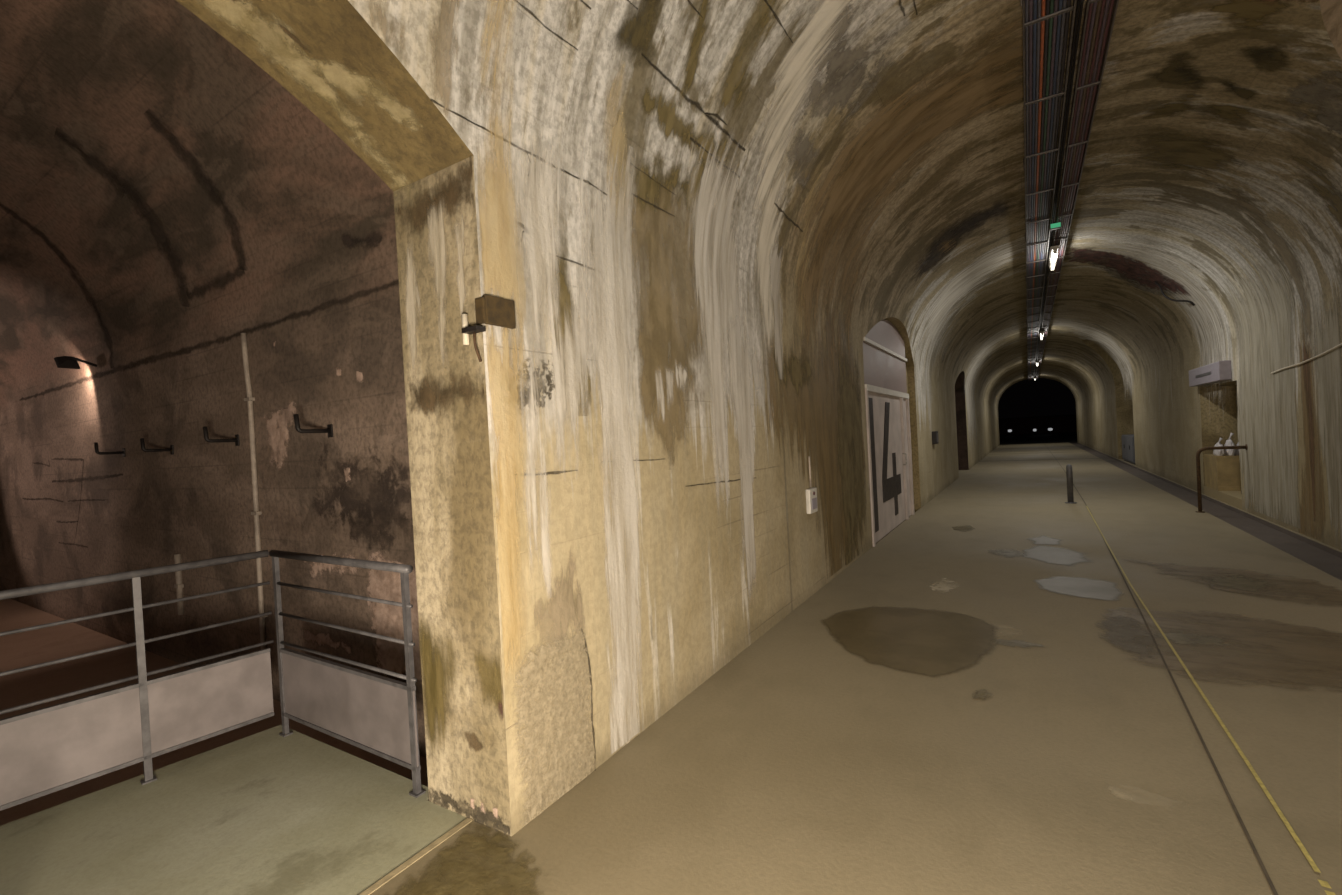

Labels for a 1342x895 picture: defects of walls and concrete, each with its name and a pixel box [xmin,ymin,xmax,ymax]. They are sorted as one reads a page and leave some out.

crack [515,0,578,50]
crack [765,0,793,44]
crack [642,54,746,179]
damp [517,0,889,753]
flaking render [264,402,296,468]
damp [314,457,411,549]
damp [419,628,454,743]
damp [476,657,502,708]
damp [1098,608,1342,691]
damp [396,828,539,895]